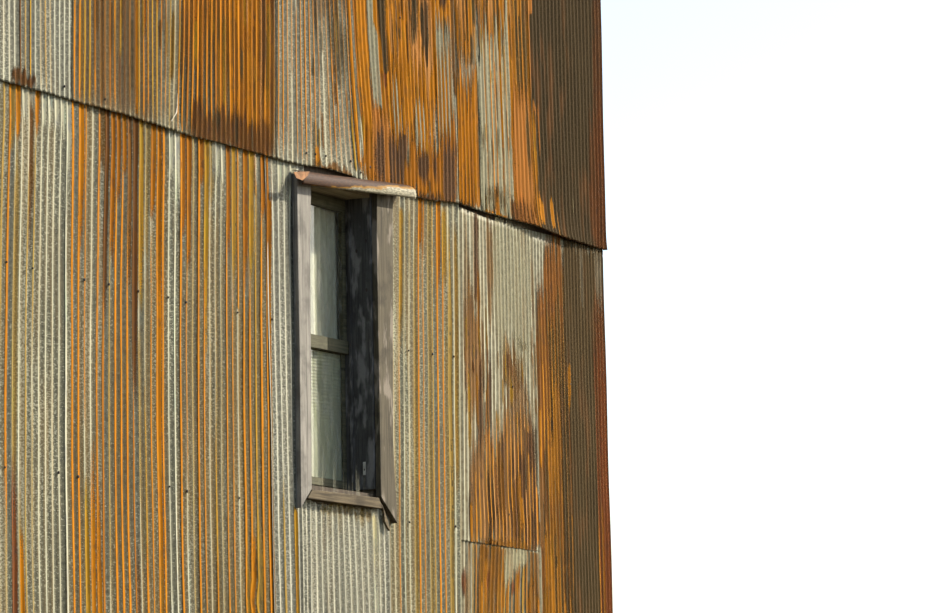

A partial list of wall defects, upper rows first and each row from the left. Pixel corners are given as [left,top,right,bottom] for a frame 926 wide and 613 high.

corrosion [0,0,47,613]
corrosion [66,0,613,613]